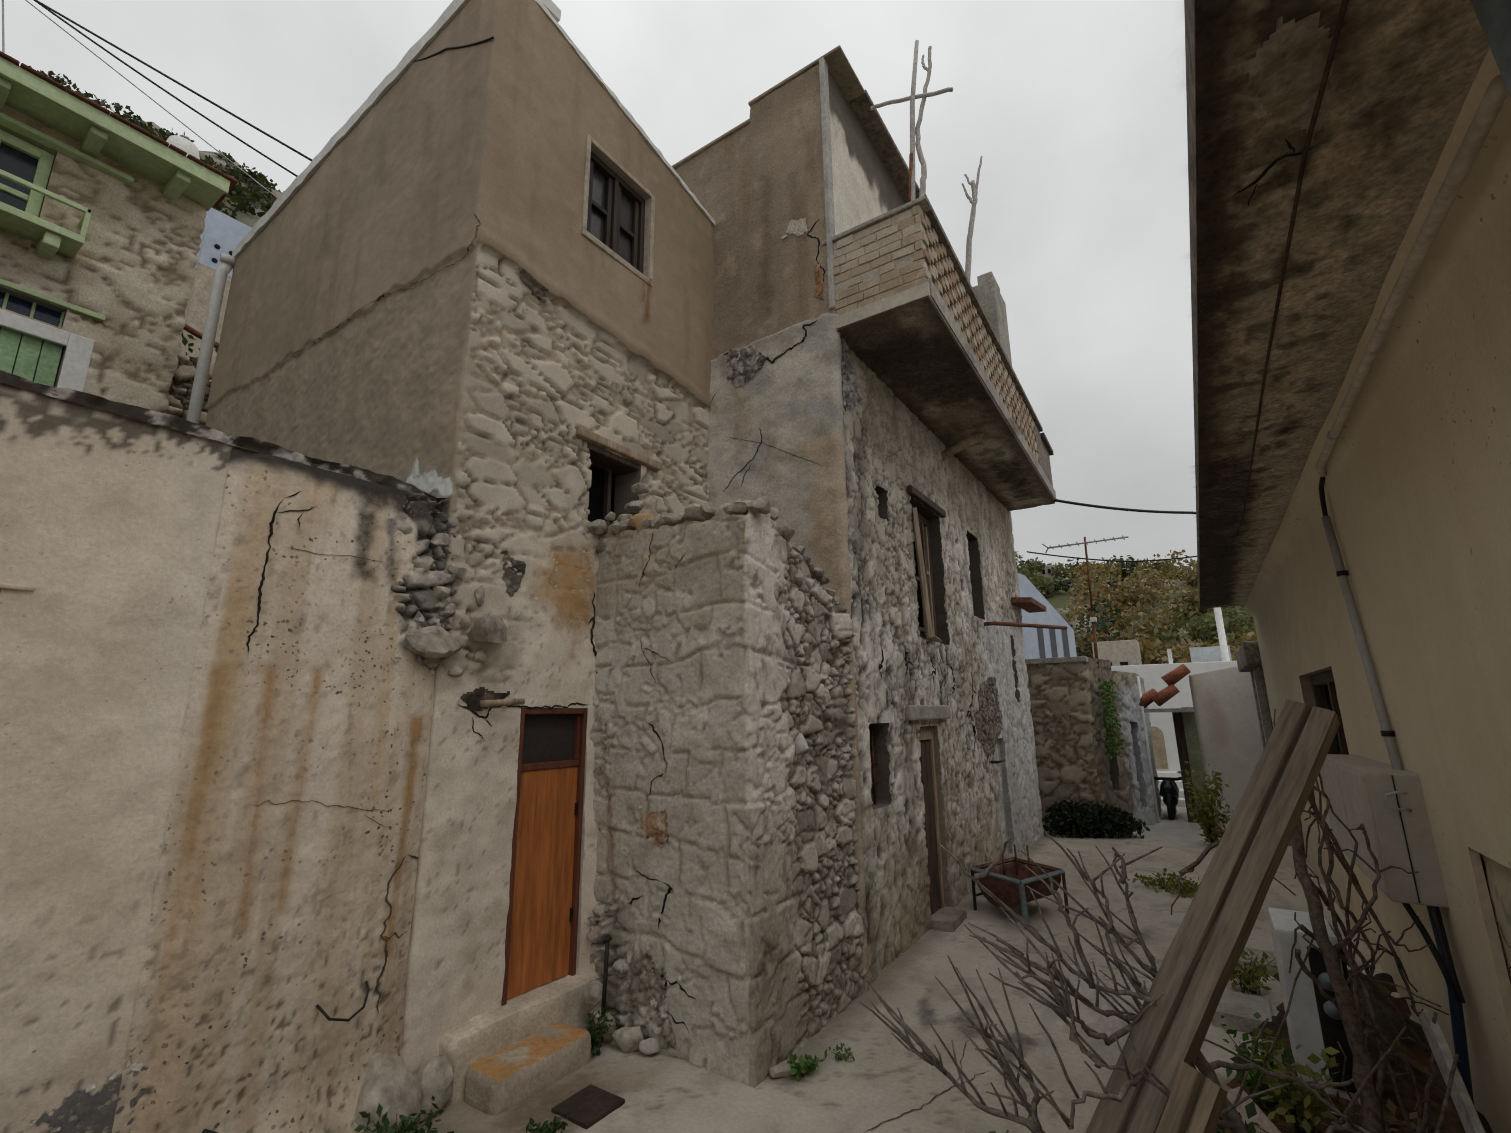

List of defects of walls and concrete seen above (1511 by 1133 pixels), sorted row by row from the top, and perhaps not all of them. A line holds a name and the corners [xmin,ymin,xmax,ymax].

crack [278,211,481,369]
crack [724,218,826,364]
crack [724,428,822,490]
crack [246,491,382,653]
damp [1202,453,1258,606]
crack [640,639,668,684]
crack [646,721,667,796]
crack [255,800,419,1017]
crack [626,833,673,928]
crack [652,968,695,1033]
peeling [28,1063,148,1133]